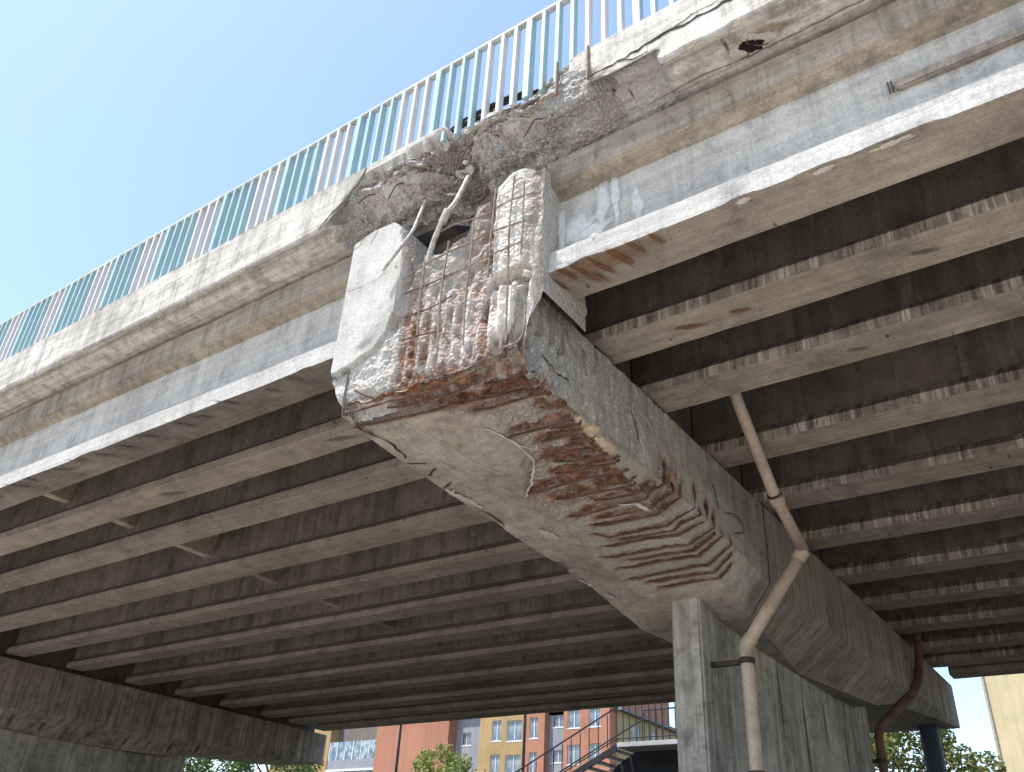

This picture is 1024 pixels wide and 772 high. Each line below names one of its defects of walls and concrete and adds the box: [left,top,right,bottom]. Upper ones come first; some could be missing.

crack [573,0,731,86]
spalling [725,30,780,59]
crack [648,0,865,105]
rust [553,242,646,290]
spalling [329,45,746,596]